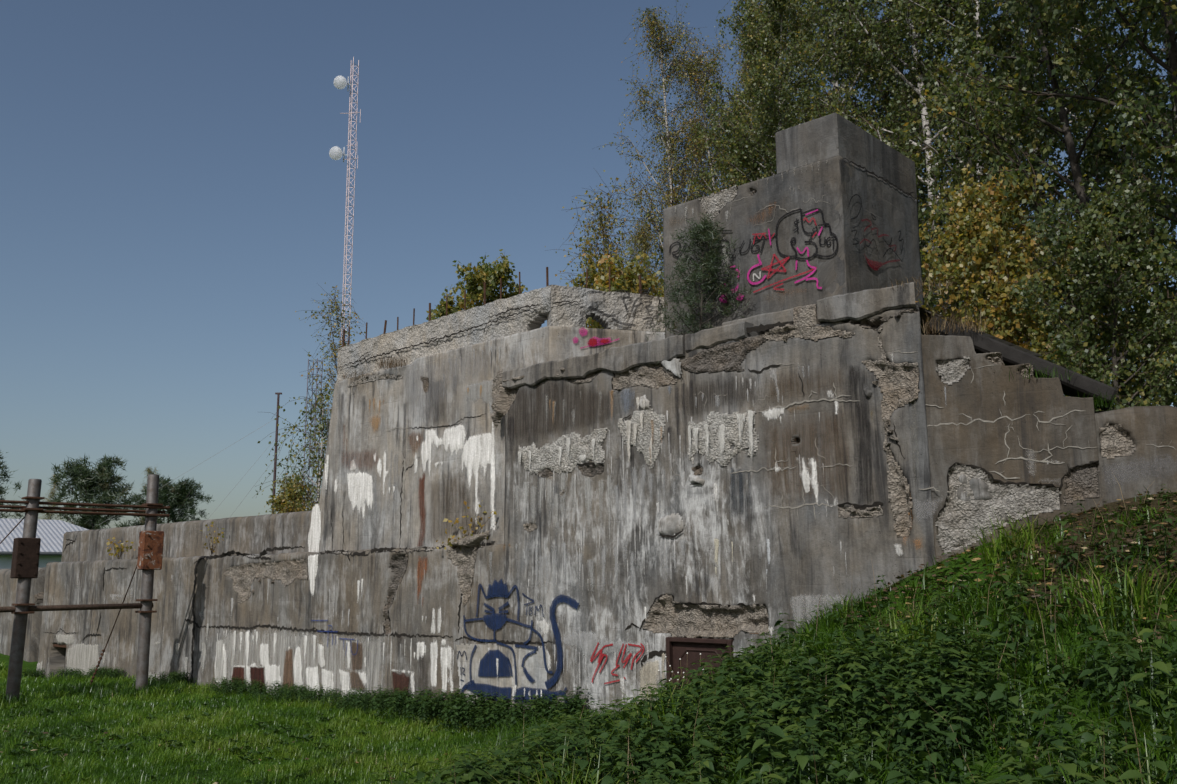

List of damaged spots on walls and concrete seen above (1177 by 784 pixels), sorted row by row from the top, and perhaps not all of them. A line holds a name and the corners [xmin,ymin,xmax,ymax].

crack [185,413,553,679]
water stain [414,370,795,706]
spalling [642,594,769,638]
spalling [556,308,920,537]
crack [920,392,1097,522]
spalling [935,423,1136,554]